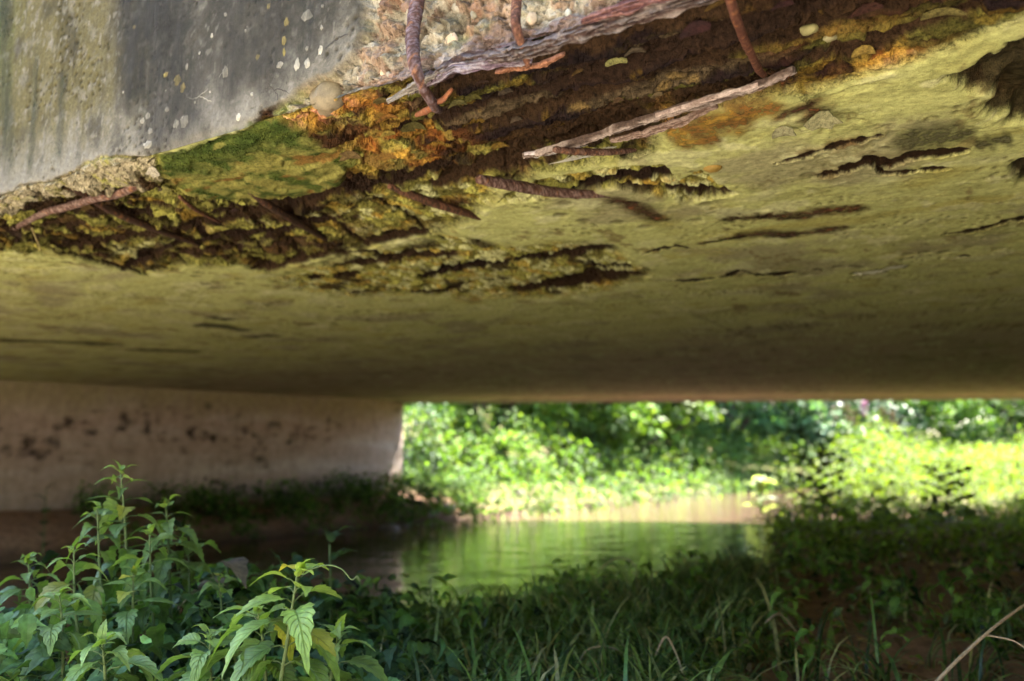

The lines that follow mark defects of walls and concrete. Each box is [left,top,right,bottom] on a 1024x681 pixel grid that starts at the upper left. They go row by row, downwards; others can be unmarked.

spalling [0,0,1024,275]
corrosion [660,69,829,148]
crack [773,133,971,180]
corrosion [608,198,669,221]